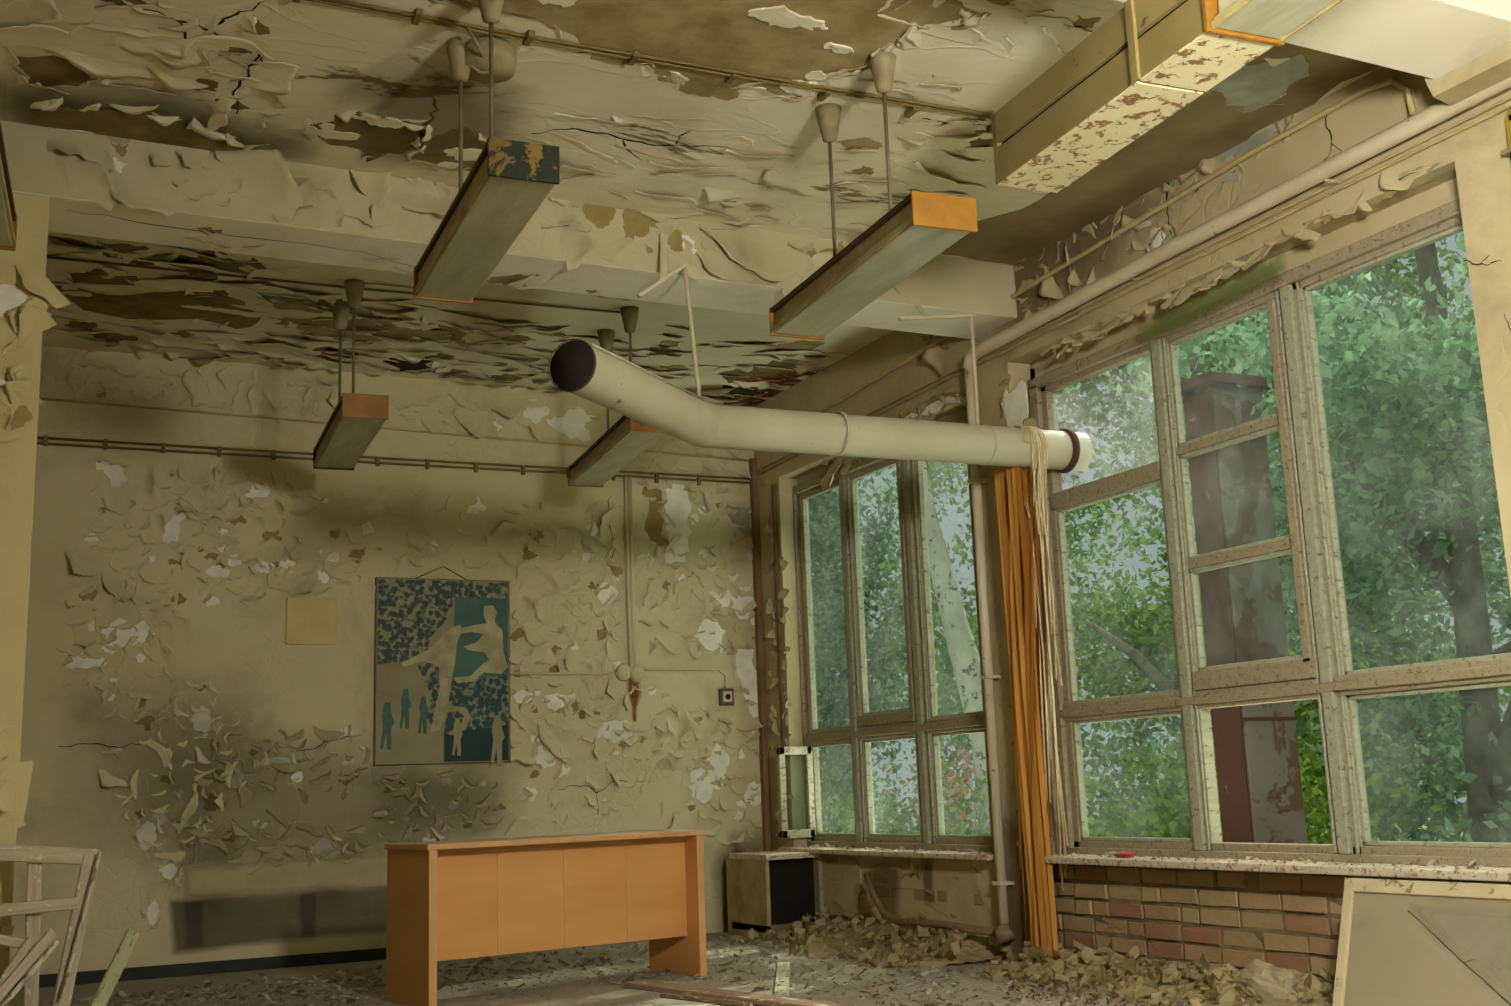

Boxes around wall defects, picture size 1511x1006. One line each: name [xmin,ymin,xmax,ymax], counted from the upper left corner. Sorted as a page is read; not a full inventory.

peeling [502,0,1050,104]
peeling [1,46,488,228]
peeling [940,42,1382,268]
peeling [539,197,669,271]
peeling [1040,158,1443,360]
peeling [0,248,485,375]
peeling [699,360,815,407]
peeling [636,480,700,576]
peeling [61,618,156,676]
peeling [694,585,760,746]
peeling [685,739,730,803]
peeling [743,776,761,807]